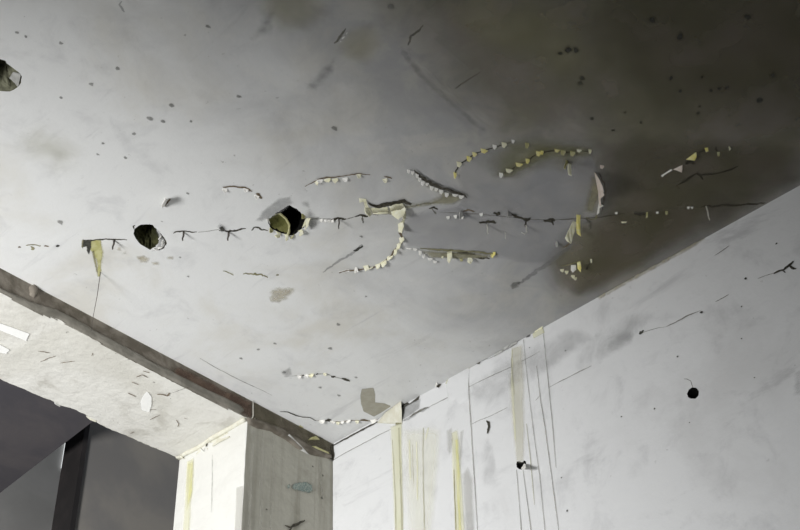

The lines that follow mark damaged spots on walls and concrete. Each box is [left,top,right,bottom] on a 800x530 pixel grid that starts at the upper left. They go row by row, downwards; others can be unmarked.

spalling [0,59,22,91]
water stain [435,0,800,288]
spalling [133,224,167,251]
crack [174,226,268,234]
spalling [267,205,311,241]
crack [310,214,368,223]
peeling [339,169,498,273]
crack [405,202,764,230]
crack [760,261,796,278]
water stain [516,327,568,530]
water stain [392,425,429,530]
water stain [453,432,463,530]